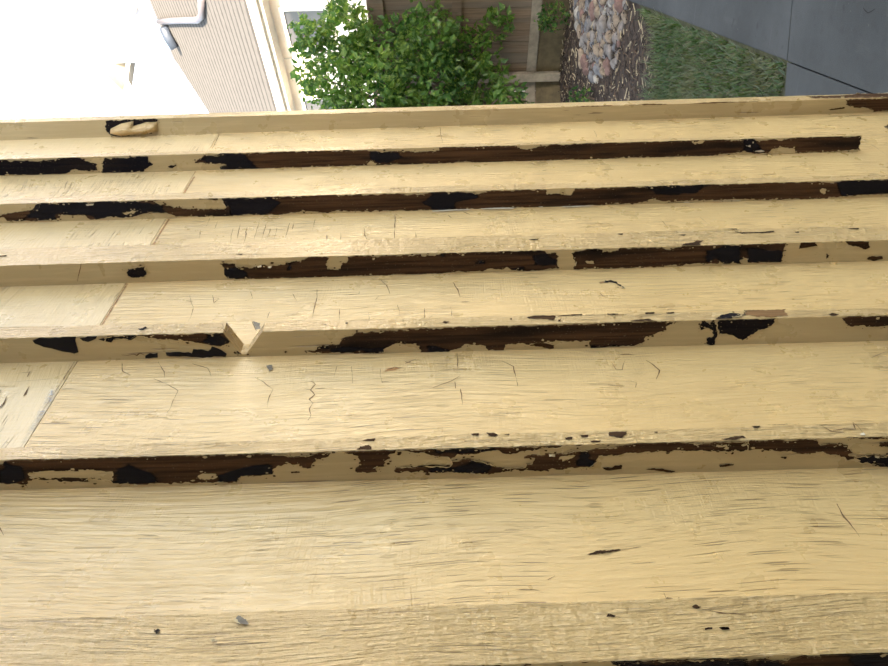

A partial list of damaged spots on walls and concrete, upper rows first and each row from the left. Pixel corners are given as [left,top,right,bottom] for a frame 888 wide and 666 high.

peeling [809,93,888,112]
peeling [0,156,153,176]
peeling [194,136,861,170]
peeling [0,179,888,222]
peeling [221,239,559,280]
peeling [571,228,788,288]
spalling [841,241,883,261]
peeling [33,327,231,359]
peeling [305,312,676,355]
peeling [829,313,888,329]
peeling [0,423,888,488]
peeling [575,652,888,666]